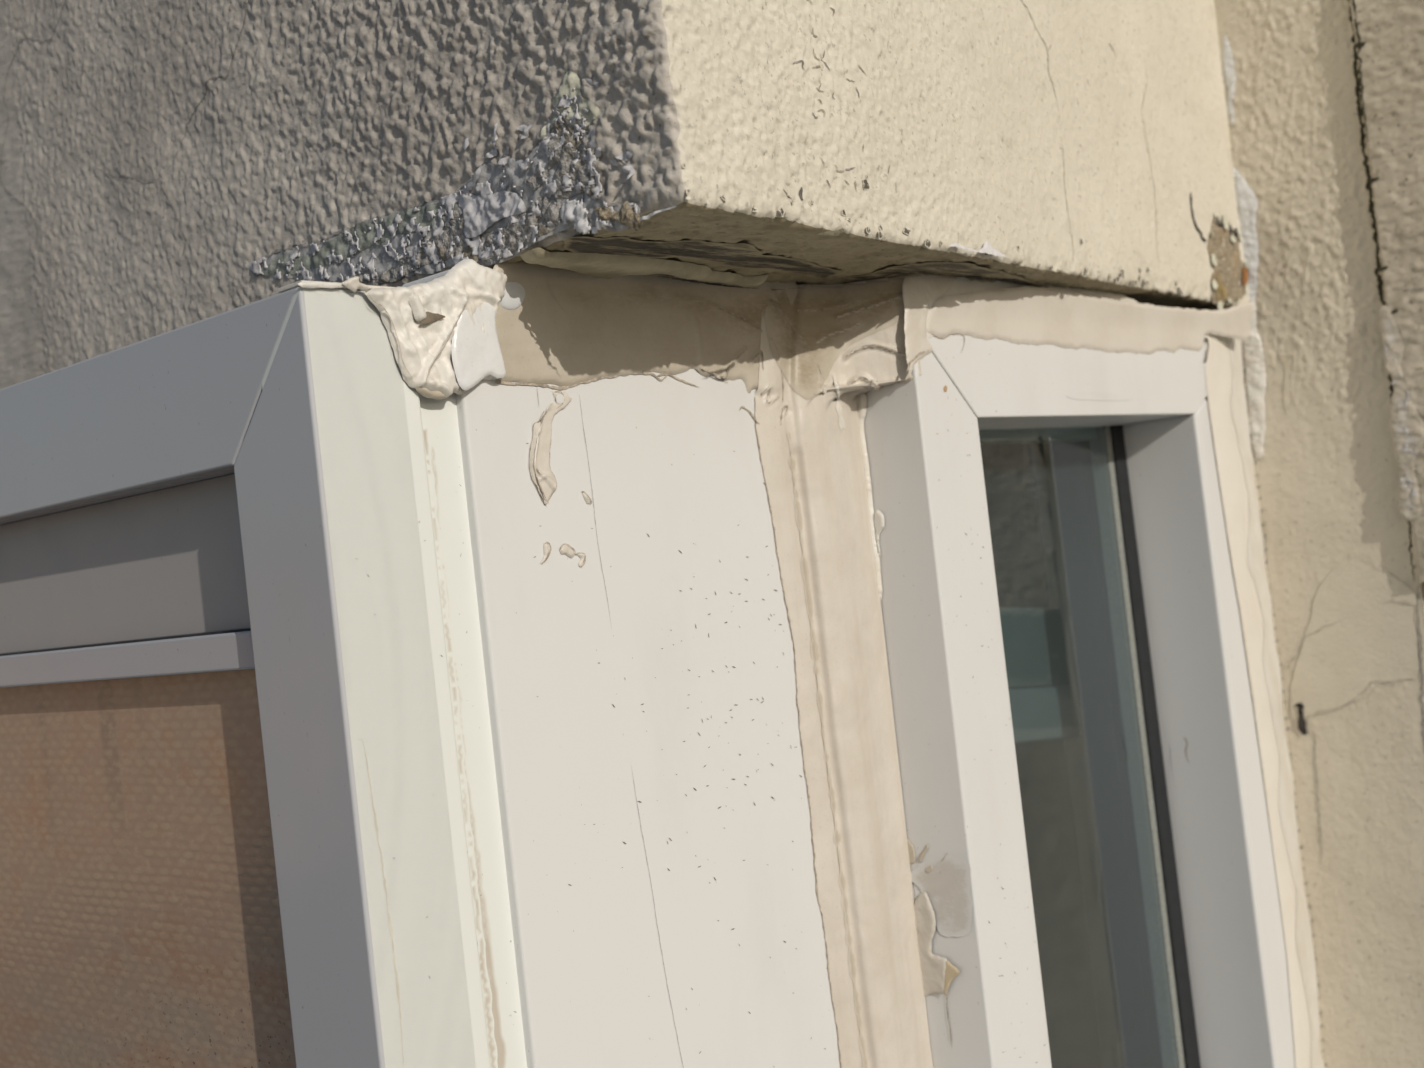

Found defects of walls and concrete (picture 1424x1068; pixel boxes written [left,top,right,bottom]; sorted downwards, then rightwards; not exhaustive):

crack [93,0,247,257]
peeling [246,70,676,286]
water stain [548,227,1060,400]
spalling [1208,211,1249,310]
crack [1349,0,1424,314]
crack [1387,374,1395,402]
crack [1295,521,1424,864]